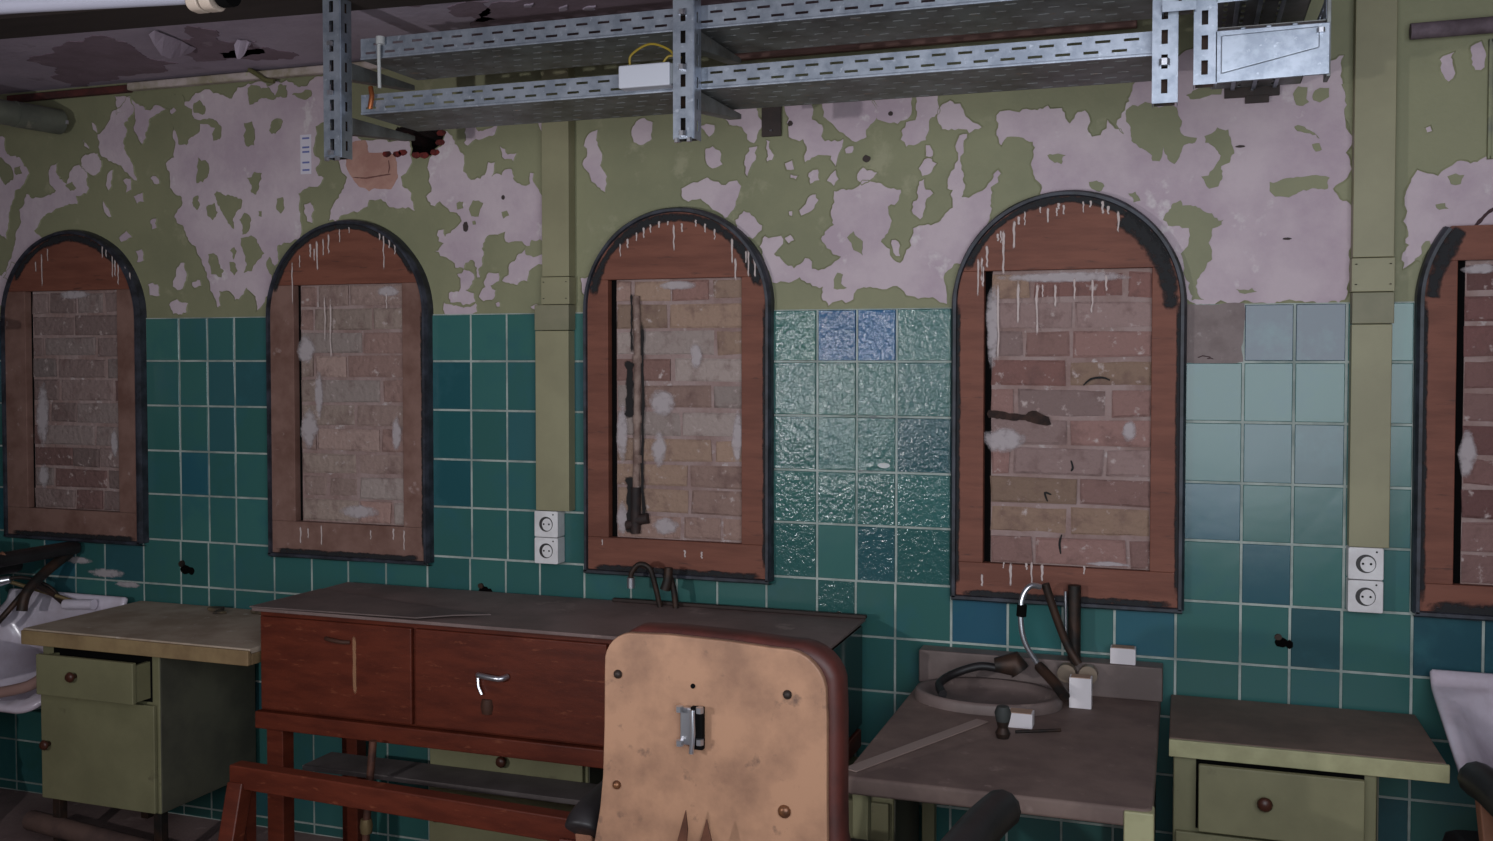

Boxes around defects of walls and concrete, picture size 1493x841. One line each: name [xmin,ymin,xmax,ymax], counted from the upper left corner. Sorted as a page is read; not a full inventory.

peeling [447,0,673,43]
peeling [697,0,935,23]
water stain [15,235,131,284]
peeling [0,26,542,316]
water stain [273,224,413,303]
peeling [581,129,609,193]
water stain [590,213,761,293]
peeling [680,47,1353,363]
peeling [1400,154,1493,270]
water stain [280,313,423,561]
water stain [596,309,765,579]
water stain [956,196,1180,607]